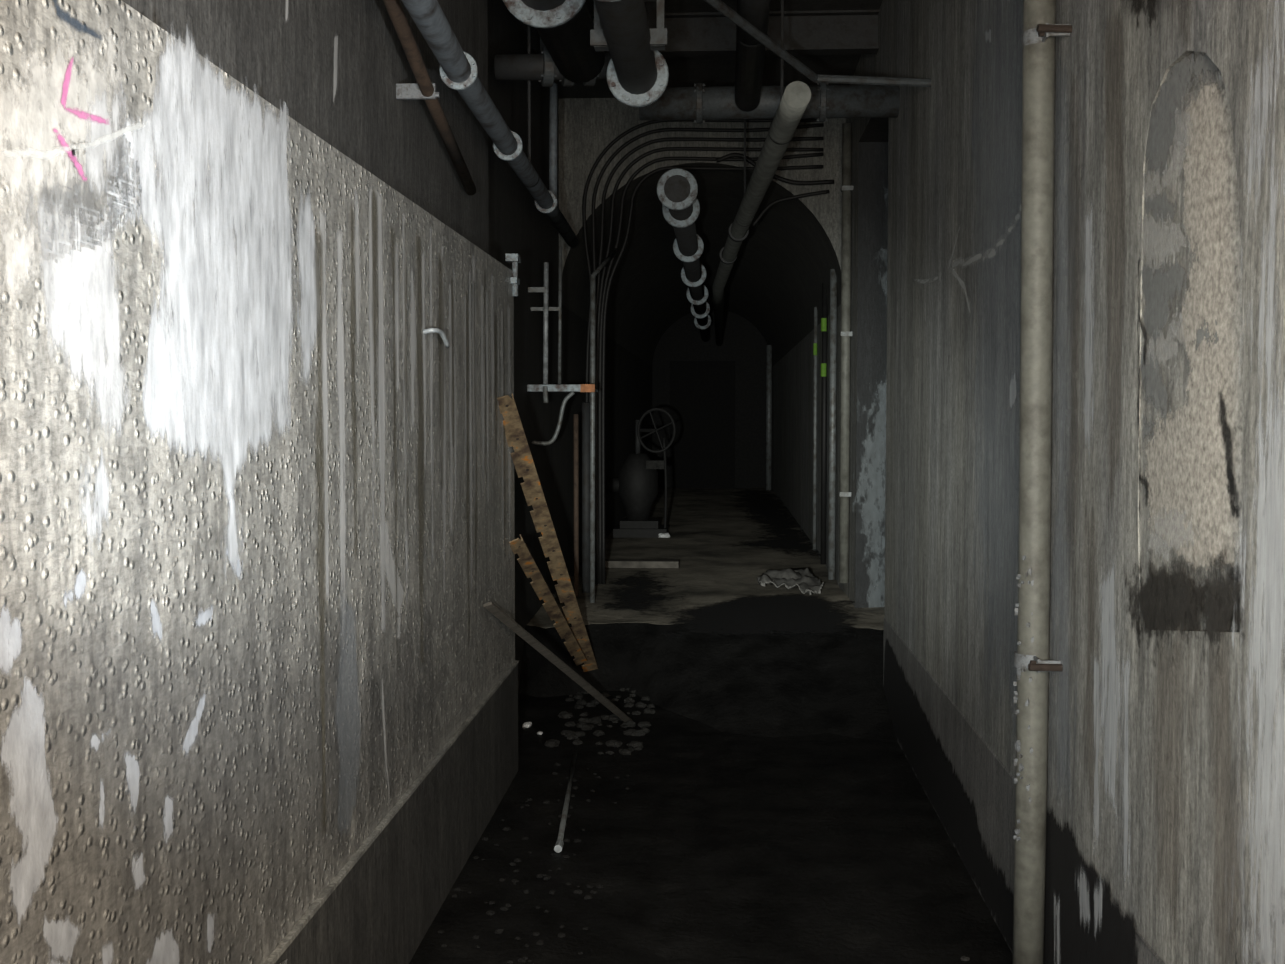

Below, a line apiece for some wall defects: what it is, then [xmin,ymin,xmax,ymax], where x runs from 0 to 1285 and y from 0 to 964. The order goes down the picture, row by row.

leakage [1094,65,1285,964]
peeling [0,607,22,672]
peeling [151,599,162,640]
peeling [183,695,205,753]
peeling [1,678,58,924]
peeling [125,753,140,829]
peeling [163,795,173,843]
leakage [884,640,1014,952]
peeling [132,853,145,890]
leakage [1044,808,1138,964]
peeling [43,918,78,964]
peeling [147,928,180,964]